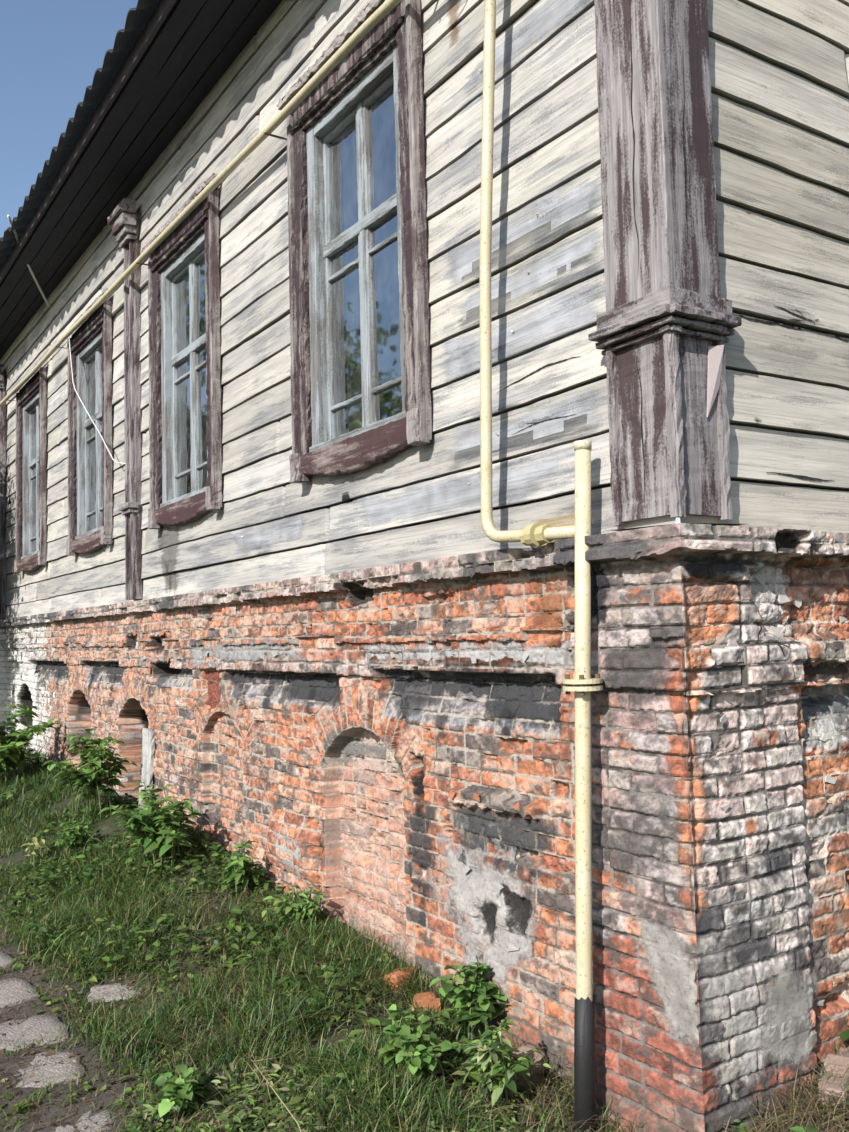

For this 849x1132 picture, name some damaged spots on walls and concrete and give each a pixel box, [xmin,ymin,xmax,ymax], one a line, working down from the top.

crack [766,472,835,482]
spalling [333,580,374,606]
peeling [121,630,303,677]
peeling [364,638,572,671]
peeling [0,641,39,752]
spalling [665,530,849,915]
spalling [411,753,425,796]
flaking render [430,819,538,996]